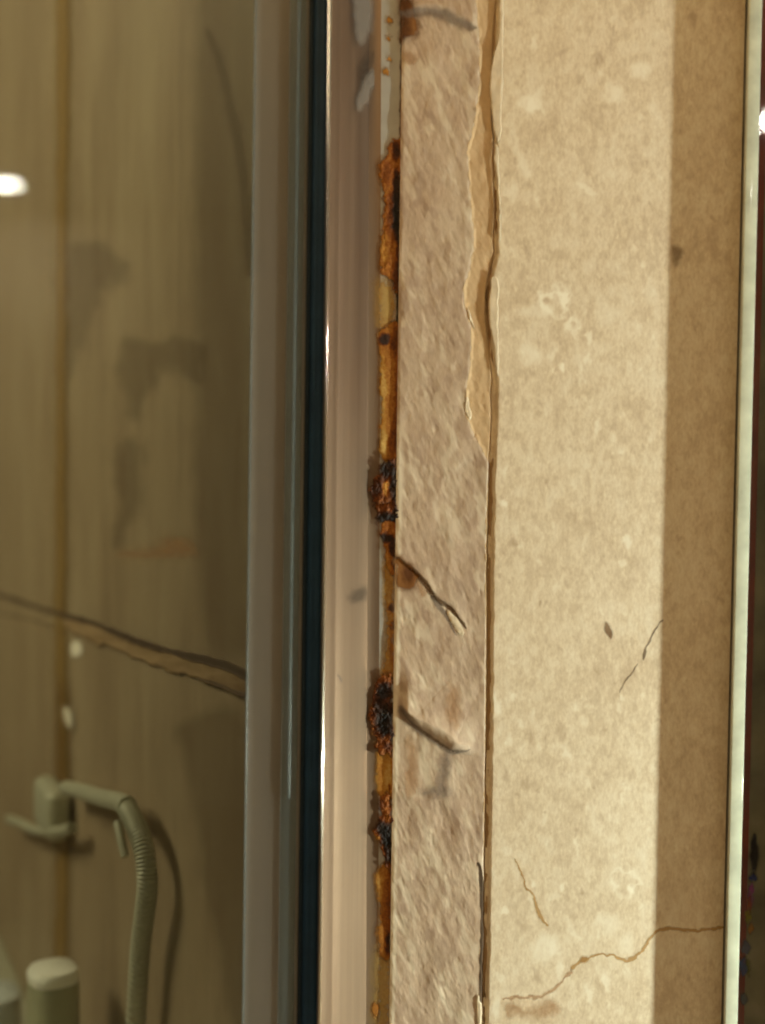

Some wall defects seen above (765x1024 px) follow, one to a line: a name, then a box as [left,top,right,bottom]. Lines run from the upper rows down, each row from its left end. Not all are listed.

spalling [463,0,504,463]
rust [368,0,419,1024]
crack [398,557,467,636]
crack [620,620,663,691]
crack [399,707,470,753]